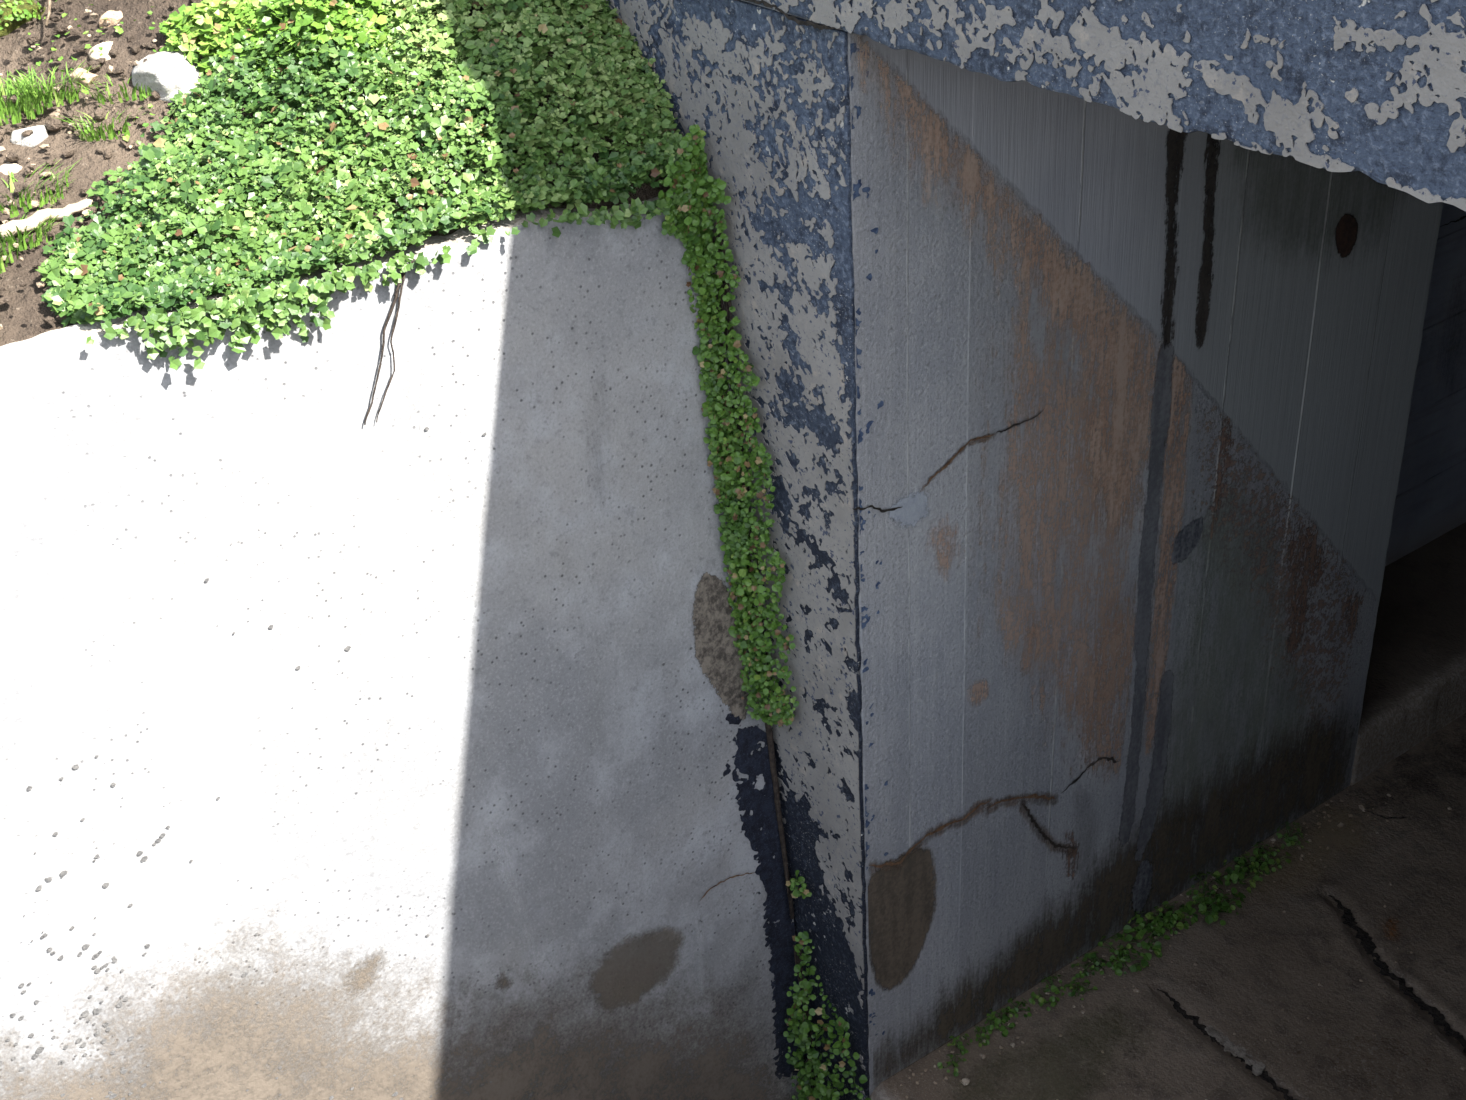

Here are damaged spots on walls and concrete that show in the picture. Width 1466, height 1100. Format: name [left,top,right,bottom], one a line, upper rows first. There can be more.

peeling [1333,0,1466,153]
water stain [1160,129,1188,347]
corrosion [1335,214,1358,258]
peeling [1385,177,1466,211]
crack [852,409,1044,513]
peeling [605,0,1355,1080]
corrosion [1146,357,1191,753]
corrosion [1209,420,1234,540]
crack [869,757,1119,872]
water stain [0,928,798,1100]
water stain [868,716,1466,1081]
crack [1328,895,1466,1053]